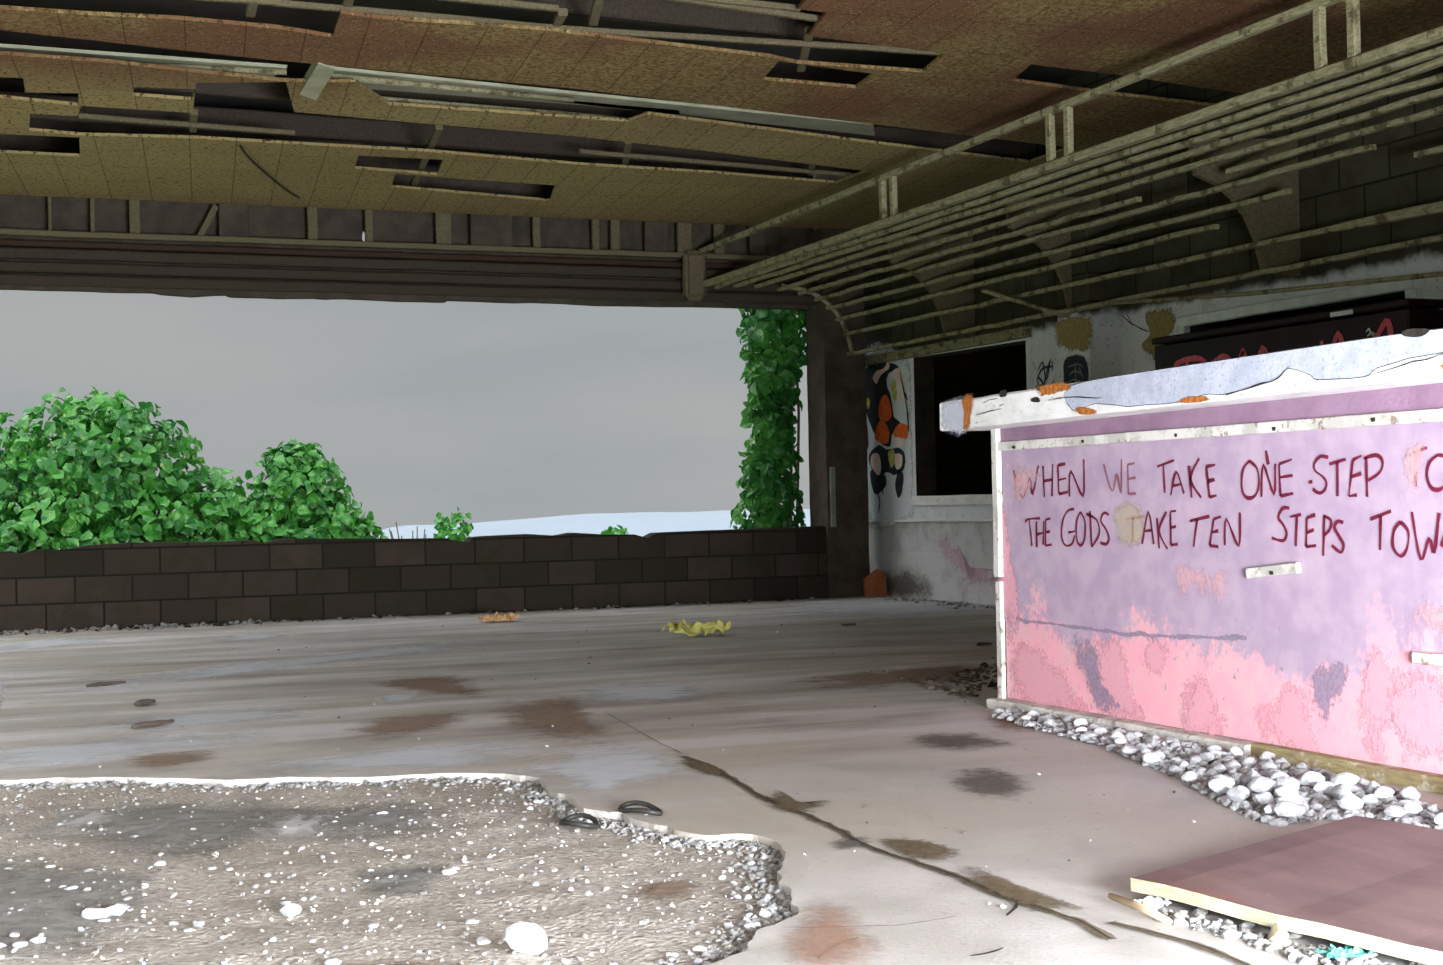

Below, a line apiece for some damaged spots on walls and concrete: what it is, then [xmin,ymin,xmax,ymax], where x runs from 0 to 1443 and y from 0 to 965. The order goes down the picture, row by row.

peeling [1064,308,1443,411]
peeling [1255,682,1318,752]
spalling [0,775,798,965]
crack [604,711,1251,965]
rust [794,910,864,963]